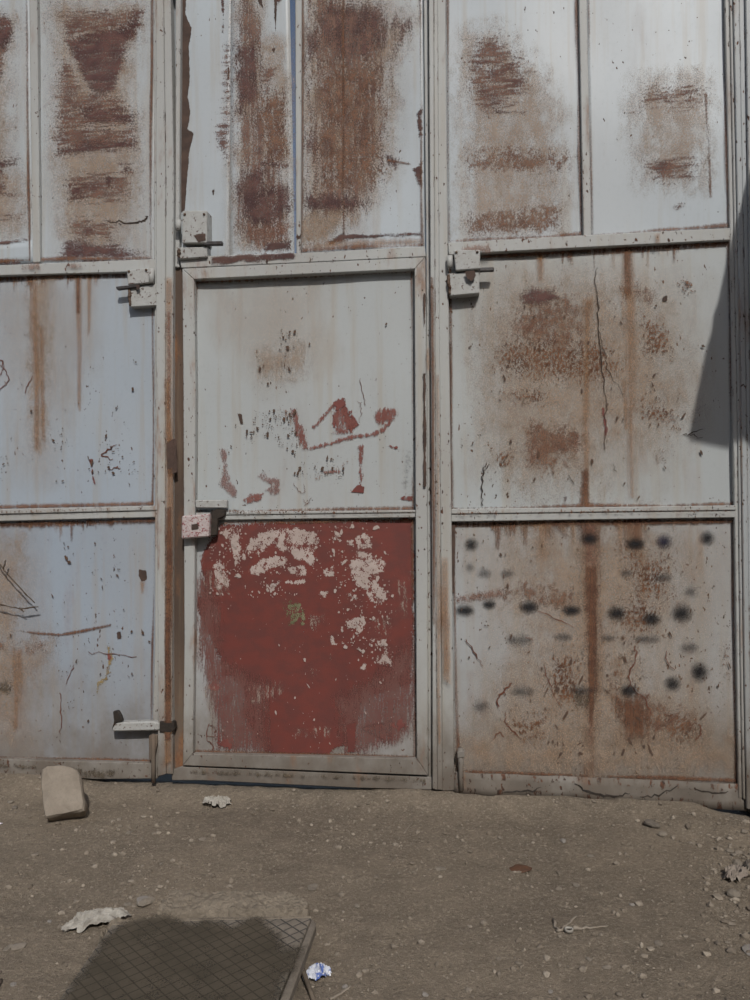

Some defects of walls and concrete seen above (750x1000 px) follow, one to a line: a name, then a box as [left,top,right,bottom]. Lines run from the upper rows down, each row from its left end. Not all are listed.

corrosion [0,0,153,388]
corrosion [0,308,155,535]
corrosion [166,312,178,474]
corrosion [196,275,334,290]
corrosion [211,0,424,265]
corrosion [449,31,737,782]
corrosion [151,507,172,740]
peeling [199,522,411,670]
corrosion [222,496,414,605]
corrosion [58,757,151,779]